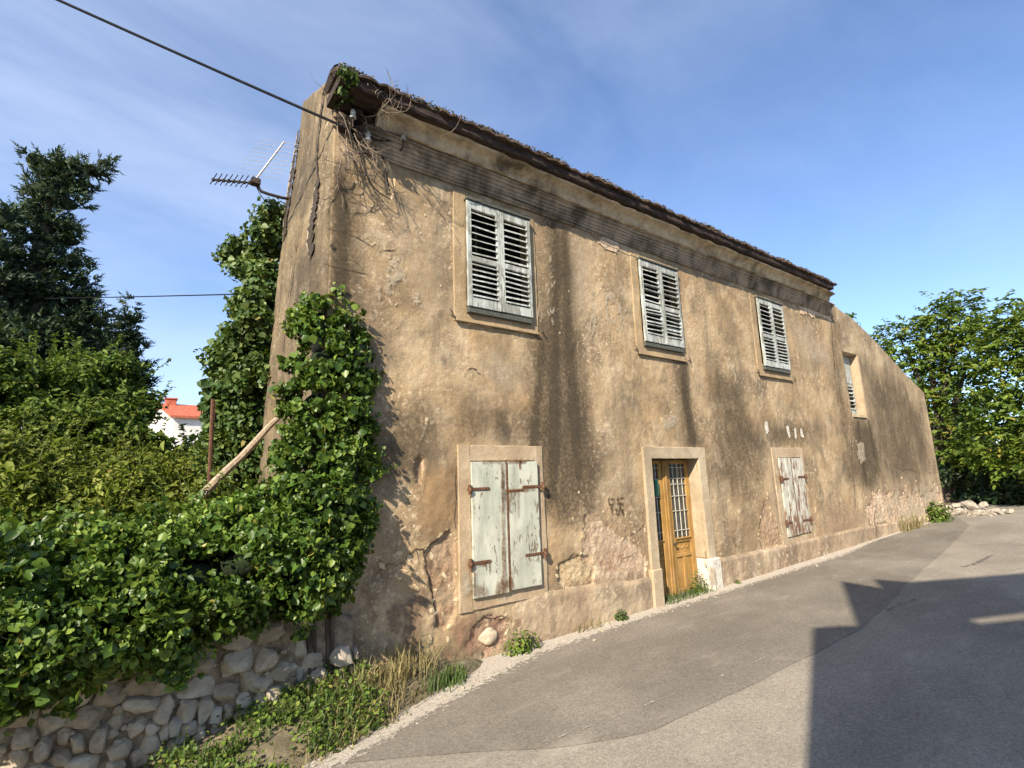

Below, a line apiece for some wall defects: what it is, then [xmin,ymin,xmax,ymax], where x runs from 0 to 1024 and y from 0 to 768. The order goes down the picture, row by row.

crack [282,87,324,352]
damp [382,406,435,477]
crack [376,466,457,623]
damp [529,220,598,522]
flaking render [555,491,649,588]
flaking render [814,477,943,526]